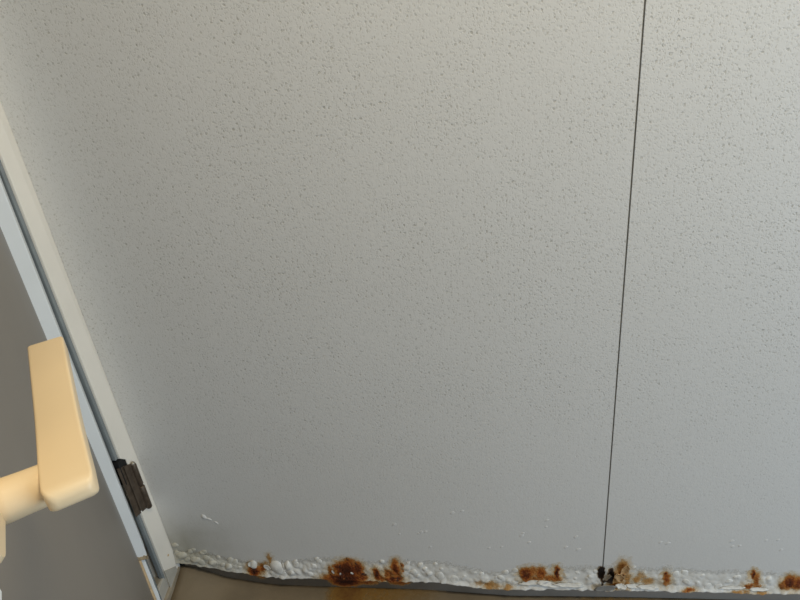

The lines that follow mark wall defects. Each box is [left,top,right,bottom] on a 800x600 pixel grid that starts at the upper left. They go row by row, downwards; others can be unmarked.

corrosion [246,554,272,578]
corrosion [321,557,410,600]
corrosion [476,565,584,591]
corrosion [602,560,672,600]
corrosion [718,568,769,595]
corrosion [779,575,800,591]